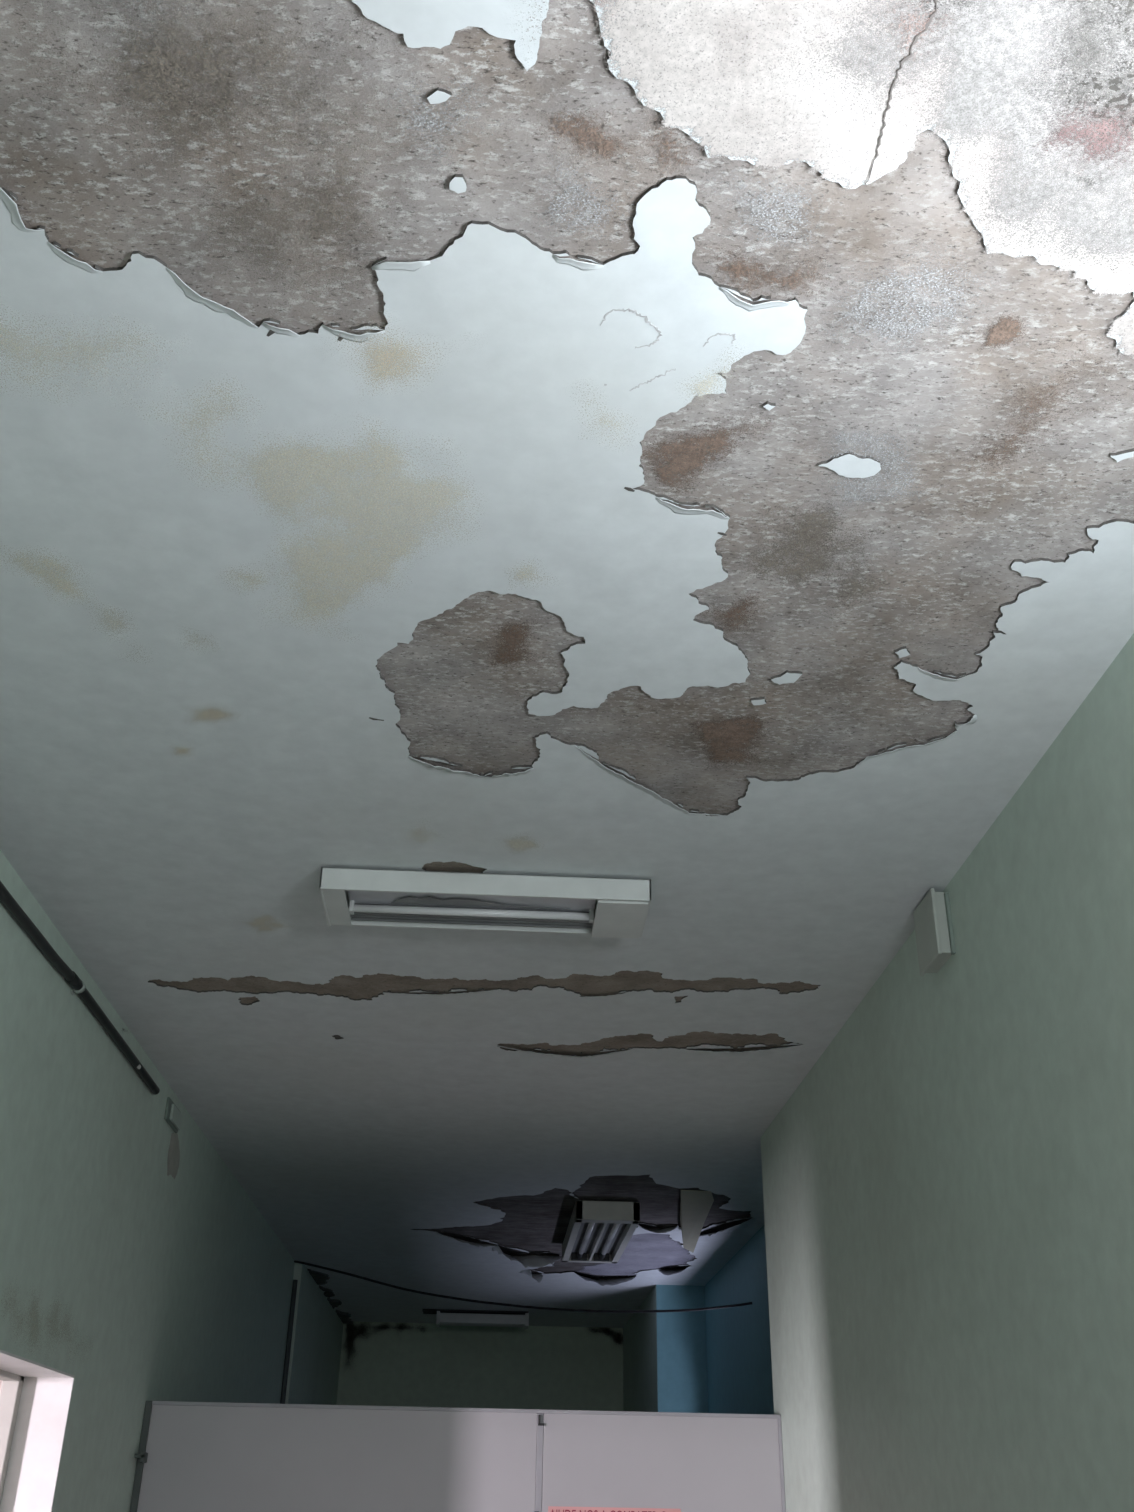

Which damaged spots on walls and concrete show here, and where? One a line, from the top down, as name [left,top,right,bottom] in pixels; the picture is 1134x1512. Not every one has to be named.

crack [865,0,938,187]
damp [539,159,624,243]
damp [592,0,1134,357]
peeling [0,0,1134,816]
damp [823,428,925,509]
peeling [148,970,821,1005]
peeling [497,1031,804,1058]
peeling [411,1175,755,1286]